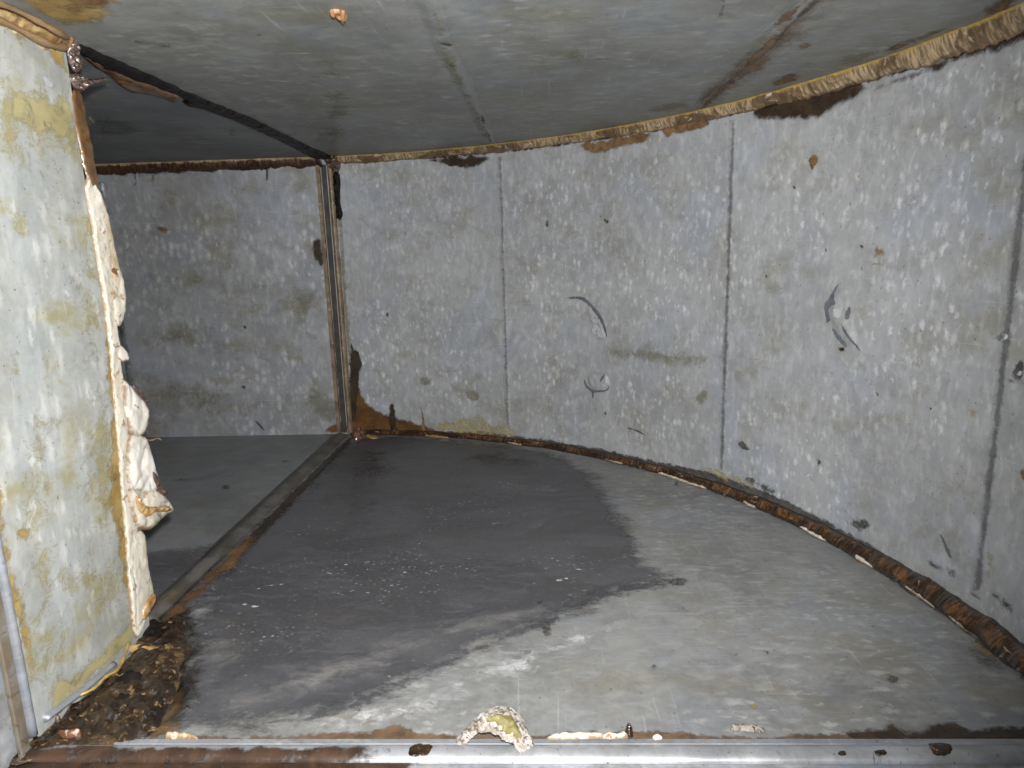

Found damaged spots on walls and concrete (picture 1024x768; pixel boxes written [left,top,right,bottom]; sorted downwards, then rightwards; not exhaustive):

leakage [3,92,76,154]
leakage [90,338,128,592]
corrosion [168,344,435,617]
leakage [148,546,212,598]
leakage [169,417,667,729]
leakage [10,576,47,665]
leakage [53,624,133,708]
corrosion [8,725,456,768]
peeling [456,706,534,754]
corrosion [612,723,1024,756]